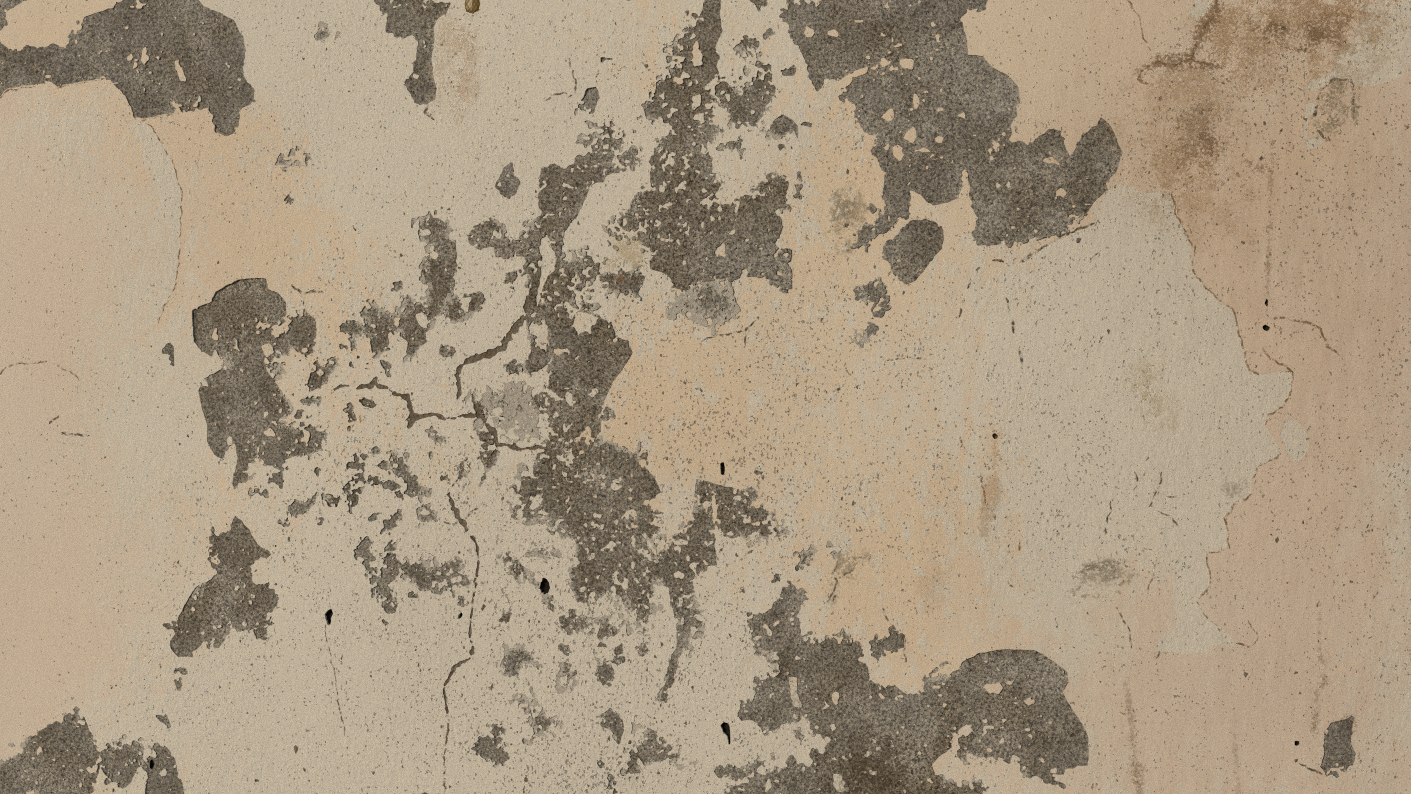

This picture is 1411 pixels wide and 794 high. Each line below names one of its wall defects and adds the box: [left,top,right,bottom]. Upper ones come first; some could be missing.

peeling [0,0,256,136]
water stain [1137,0,1224,78]
peeling [193,0,1309,794]
peeling [163,516,284,691]
crack [334,296,548,794]
peeling [0,706,184,794]
peeling [1320,716,1356,778]